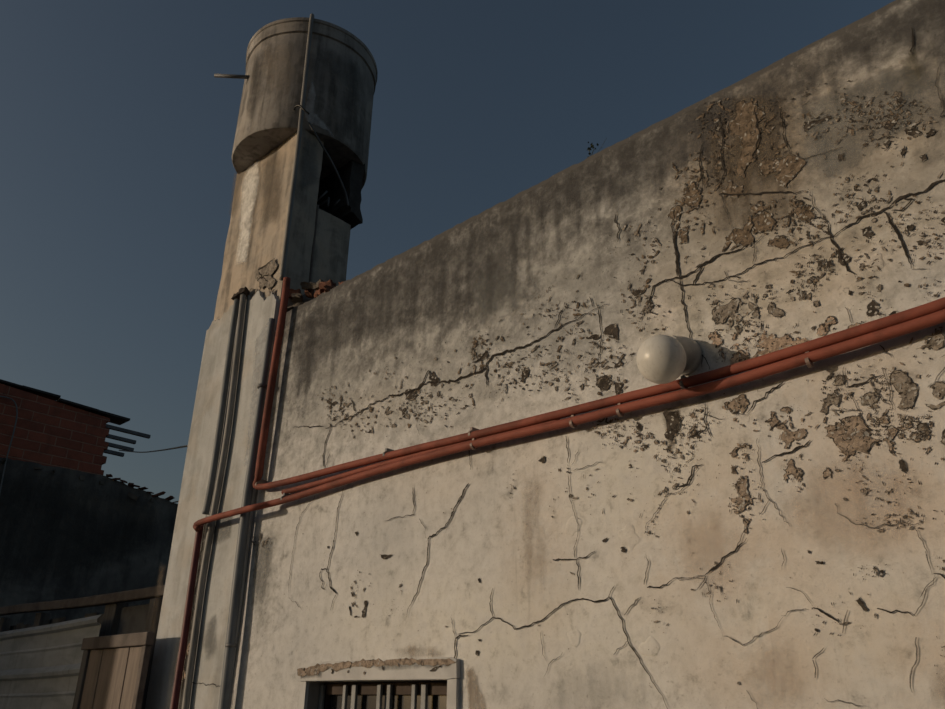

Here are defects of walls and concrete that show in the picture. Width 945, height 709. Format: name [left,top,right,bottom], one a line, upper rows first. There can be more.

flaking render [249,258,277,299]
spalling [287,279,343,308]
peeling [317,78,945,439]
crack [647,107,945,369]
crack [295,298,605,467]
crack [688,382,783,438]
peeling [593,325,945,537]
peeling [349,570,374,618]
flaking render [297,658,456,677]
crack [386,453,471,617]
crack [451,437,848,709]
crack [835,504,945,693]